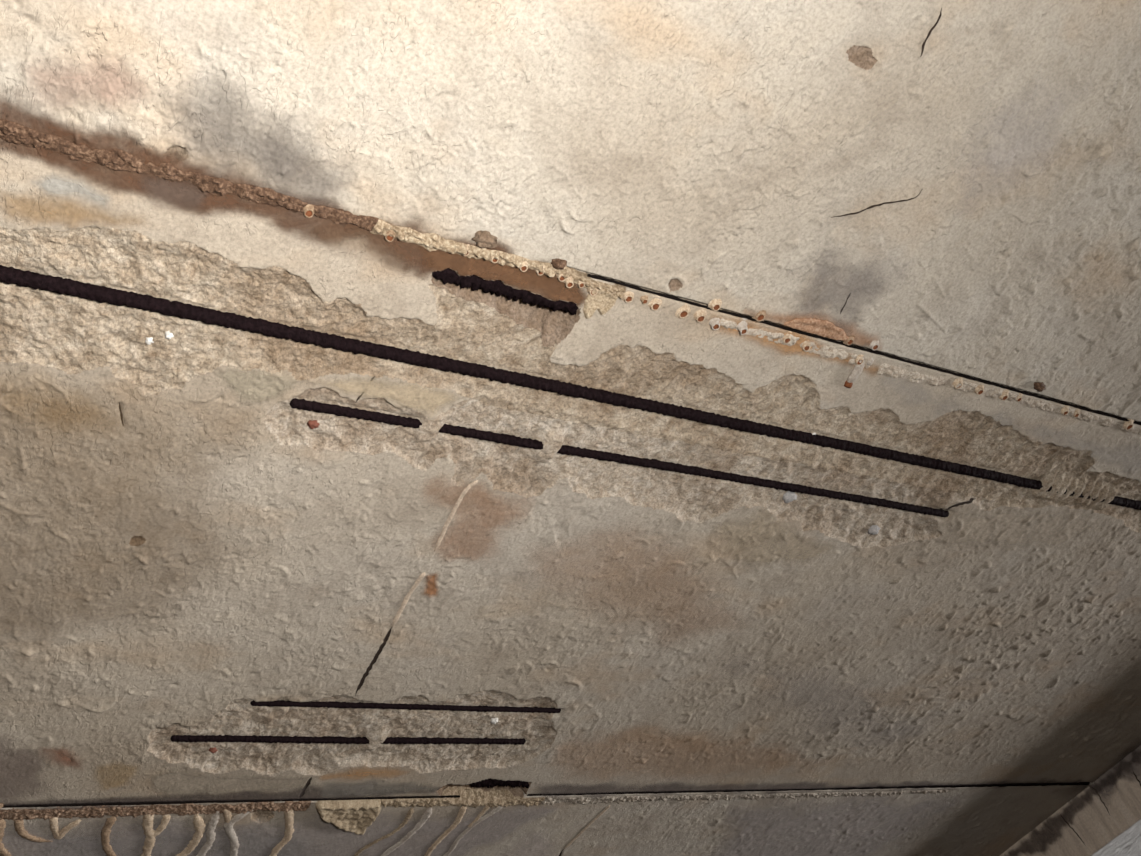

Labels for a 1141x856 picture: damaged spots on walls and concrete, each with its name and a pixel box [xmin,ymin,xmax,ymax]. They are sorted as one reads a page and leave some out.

corrosion [0,102,586,306]
spalling [0,225,1141,549]
corrosion [720,316,871,355]
crack [356,480,478,694]
spalling [147,690,561,798]
water stain [0,744,1141,856]